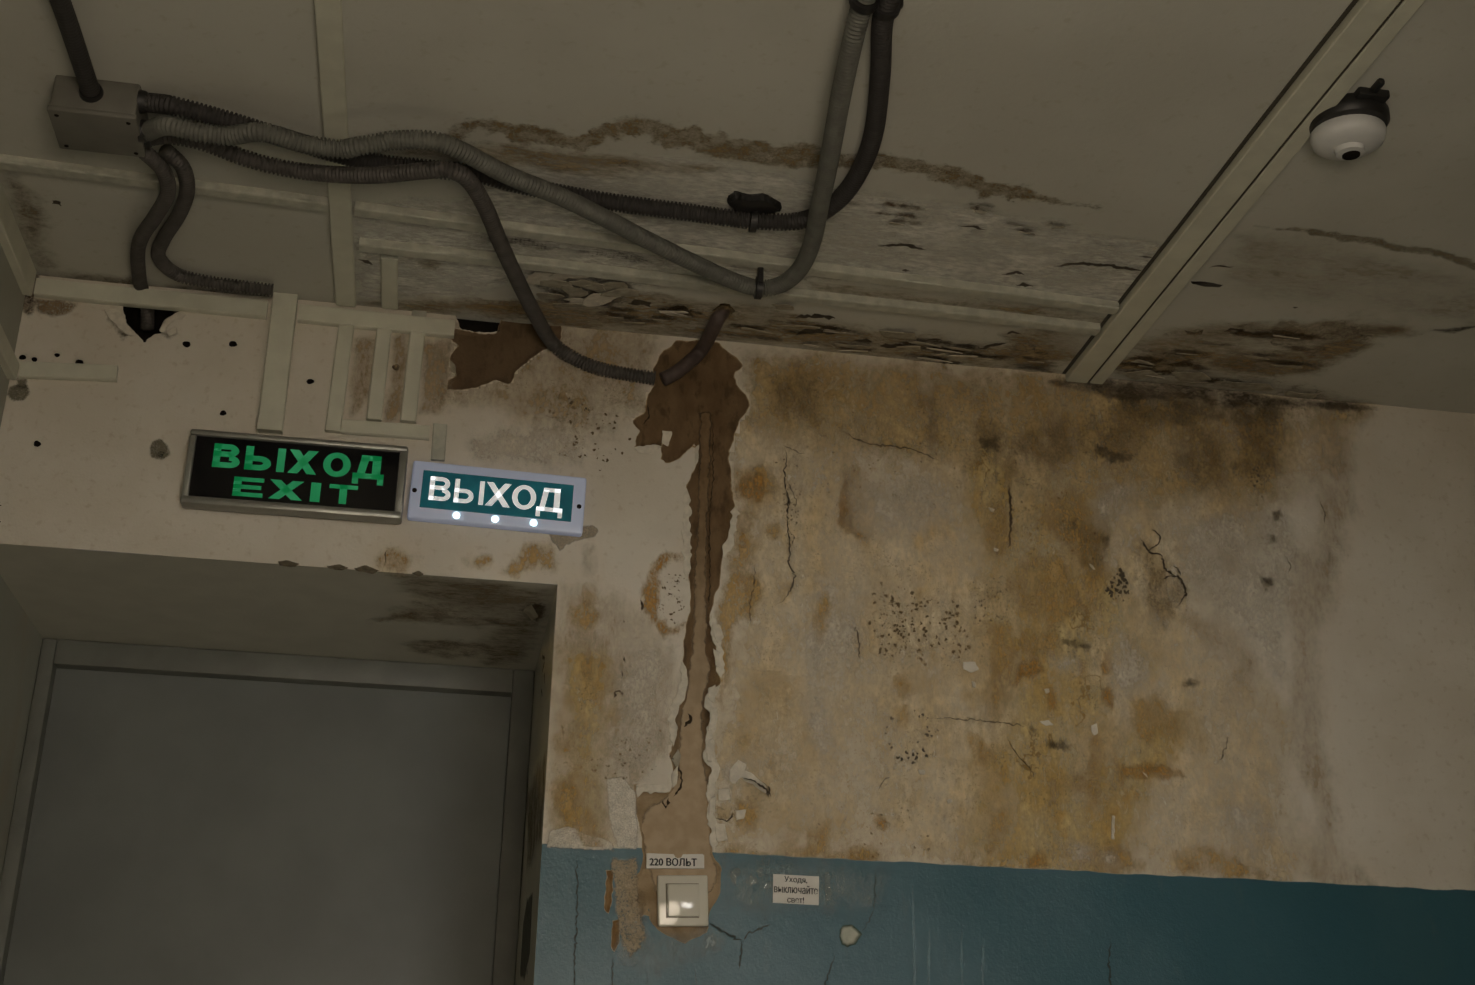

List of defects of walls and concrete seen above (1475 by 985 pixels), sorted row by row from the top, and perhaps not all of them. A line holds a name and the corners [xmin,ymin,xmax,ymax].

water stain [1280,228,1475,278]
spalling [104,306,189,342]
spalling [447,319,563,390]
peeling [526,271,640,307]
water stain [356,119,1400,881]
spalling [604,340,758,963]